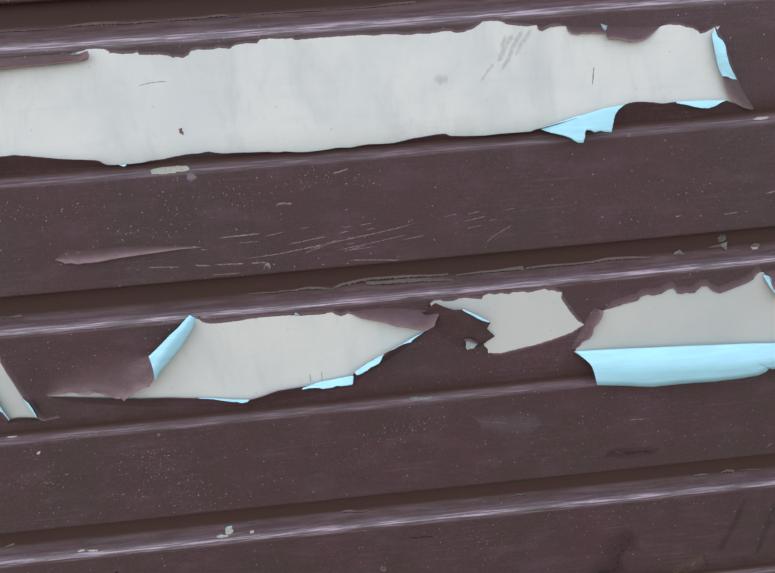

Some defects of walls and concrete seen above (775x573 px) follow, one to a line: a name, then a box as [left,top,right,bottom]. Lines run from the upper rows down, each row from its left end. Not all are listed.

peeling [0,17,768,179]
peeling [0,356,61,423]
peeling [45,265,775,407]